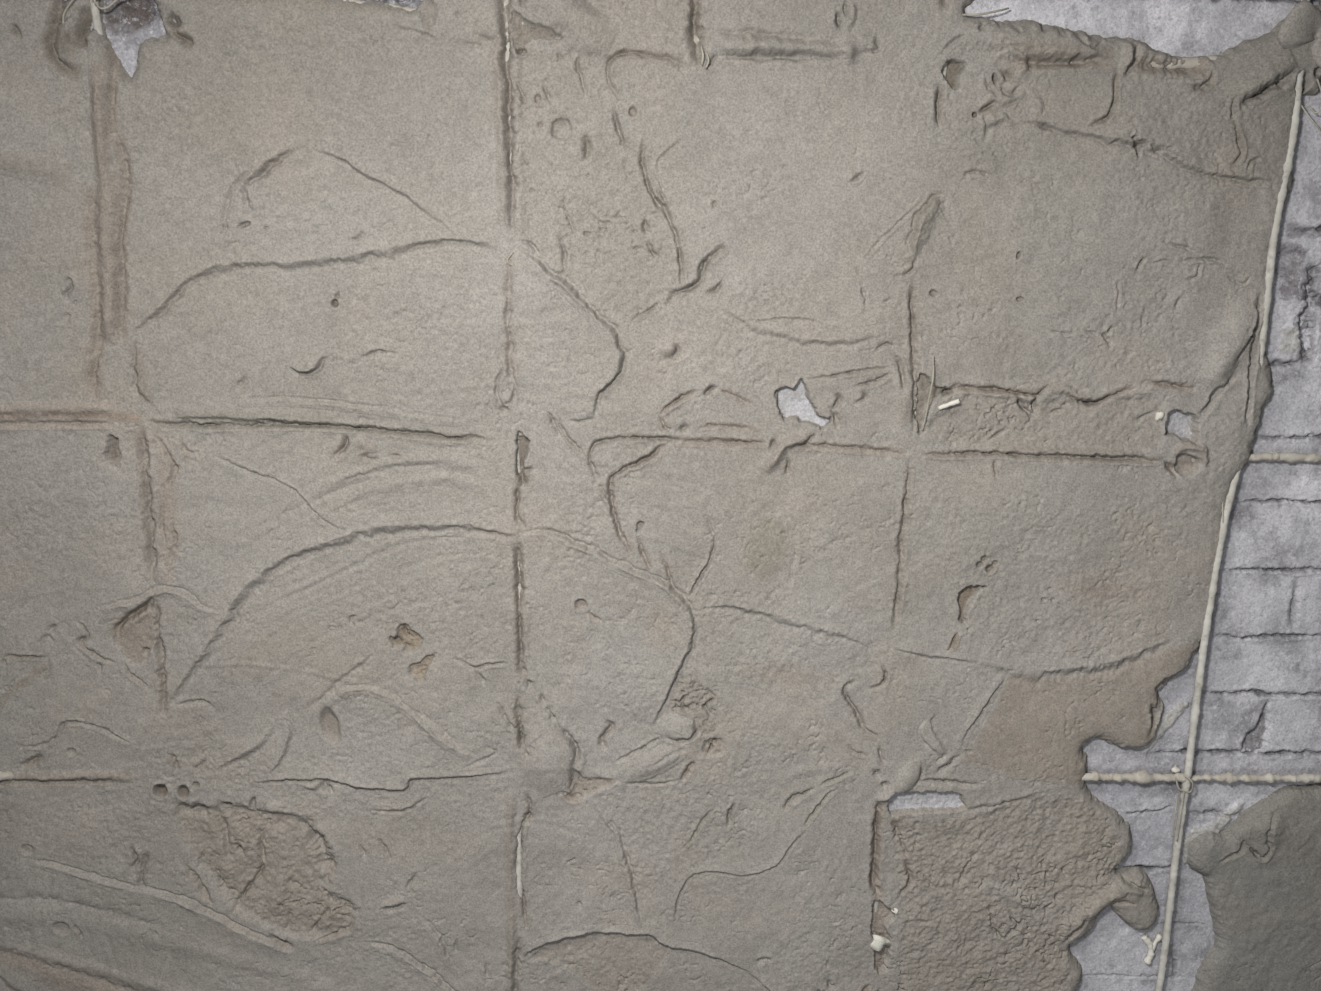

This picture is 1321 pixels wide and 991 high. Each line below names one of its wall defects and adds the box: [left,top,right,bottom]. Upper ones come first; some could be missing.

spalling [945,62,962,89]
spalling [971,66,1015,119]
spalling [777,379,829,426]
spalling [1155,410,1210,480]
crack [543,383,761,598]
crack [453,655,508,687]
spalling [1239,703,1270,750]
spalling [888,791,964,811]
peeling [870,934,891,951]